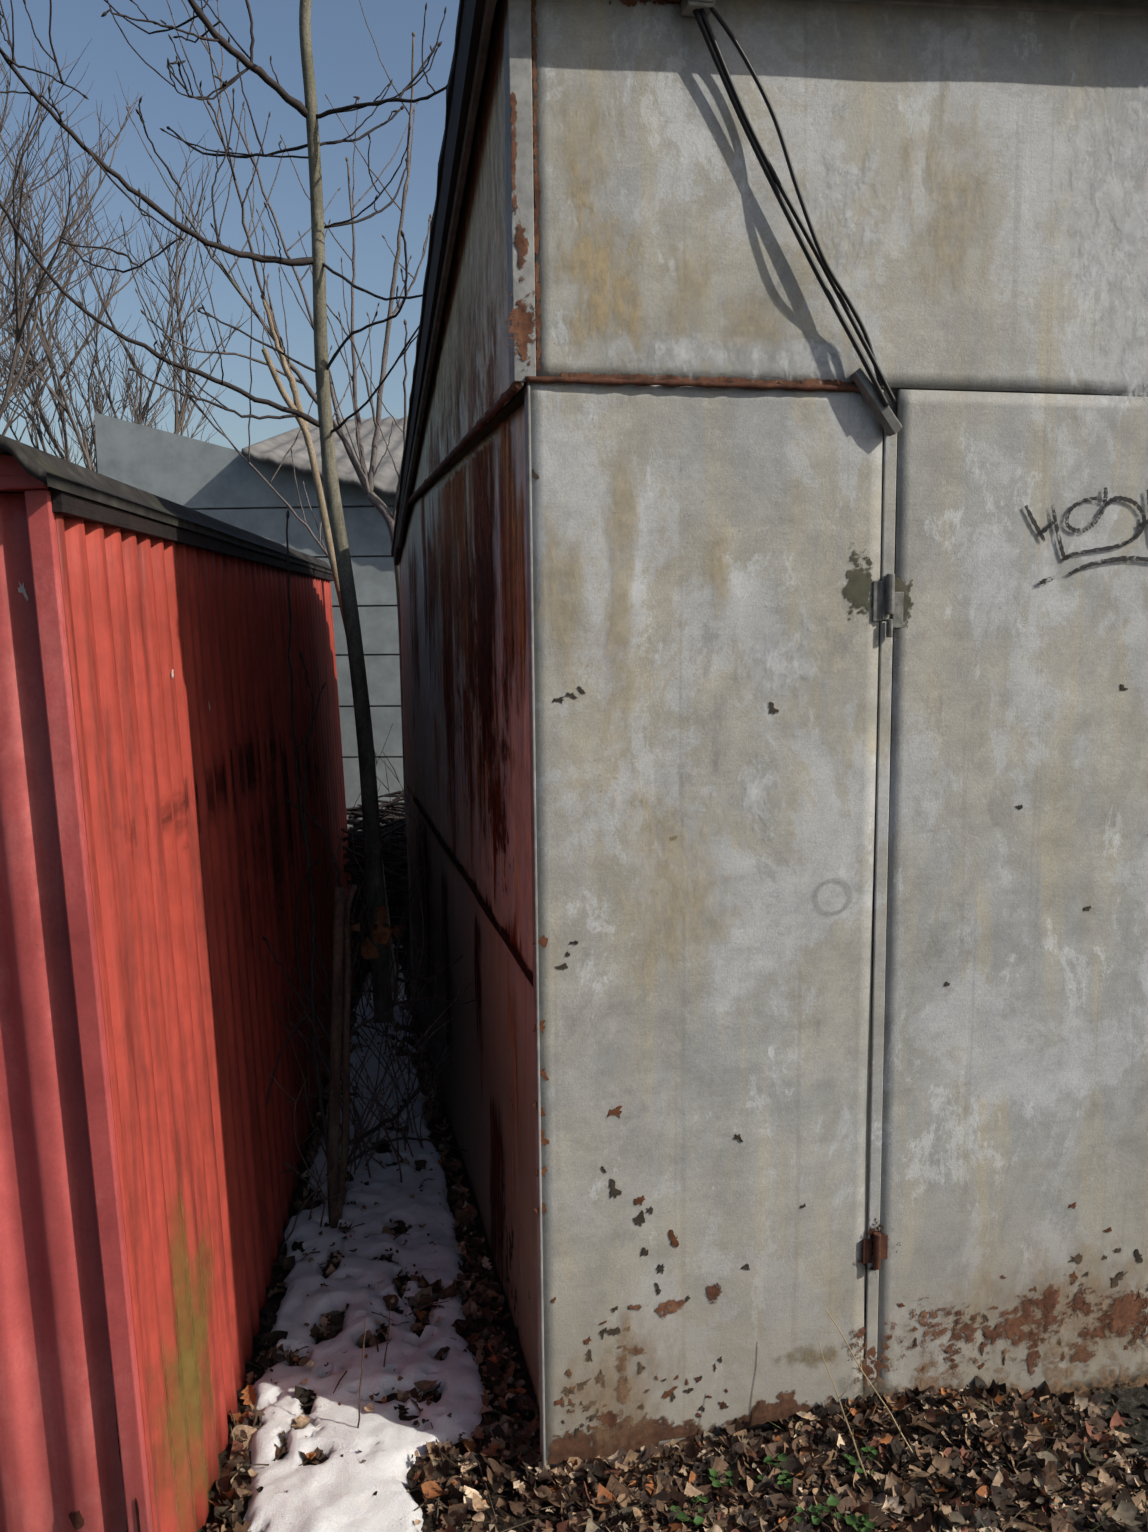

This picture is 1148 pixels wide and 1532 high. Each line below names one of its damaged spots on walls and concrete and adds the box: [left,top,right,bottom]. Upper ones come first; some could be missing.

peeling [843,542,914,639]
rust [409,0,855,1342]
peeling [601,1166,653,1226]
peeling [640,1247,665,1295]
peeling [668,1229,679,1247]
rust [858,1218,901,1274]
peeling [1102,1227,1143,1288]
peeling [554,1306,631,1412]
rust [844,1267,1148,1404]